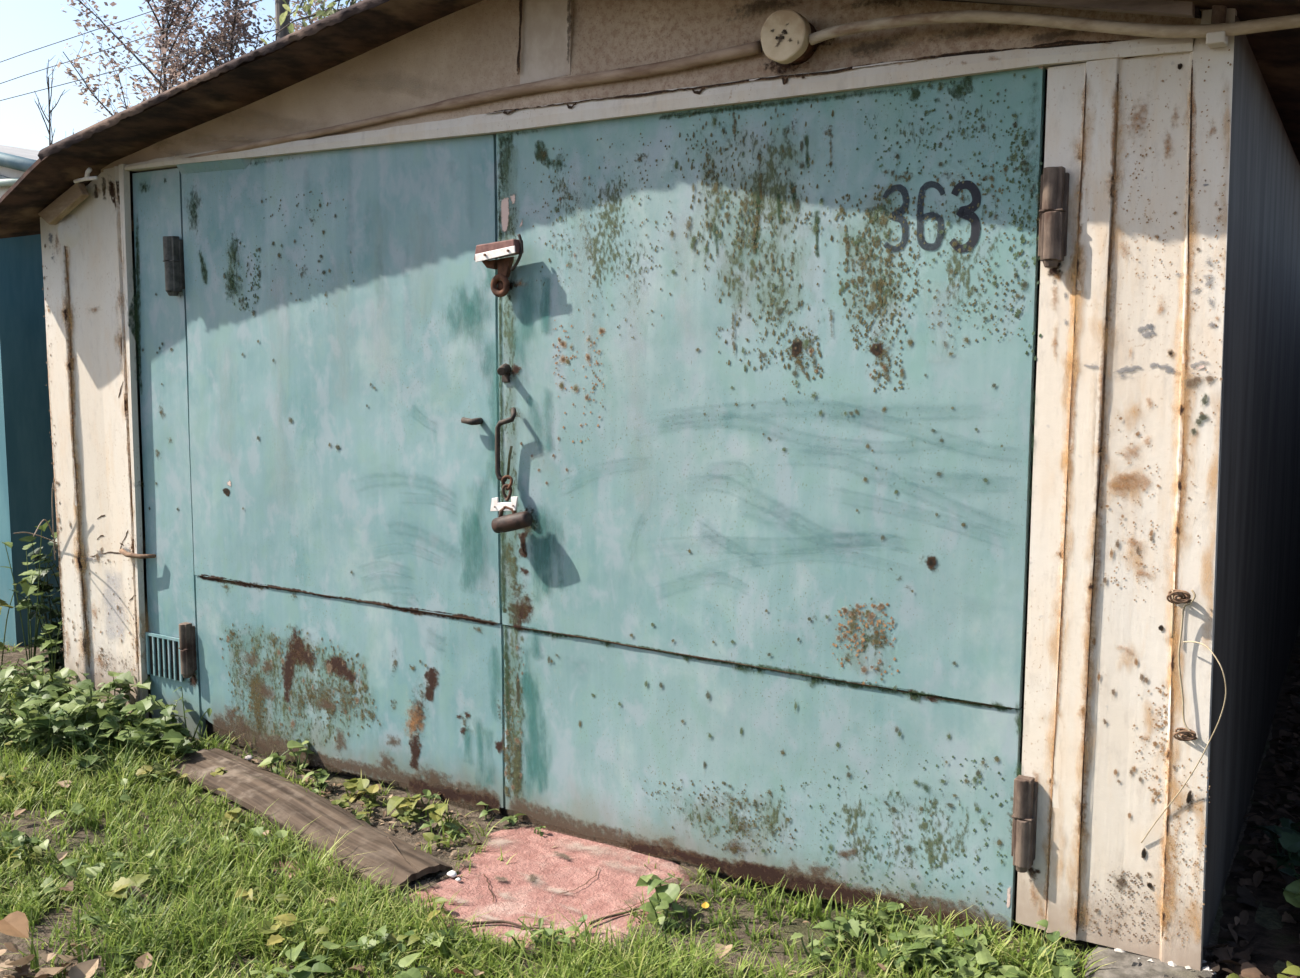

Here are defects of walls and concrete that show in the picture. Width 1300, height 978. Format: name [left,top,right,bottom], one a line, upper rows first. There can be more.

corrosion [94,178,120,208]
leakage [535,141,552,167]
corrosion [509,74,1027,443]
corrosion [42,237,140,676]
corrosion [124,398,157,561]
corrosion [199,508,1012,710]
corrosion [1074,58,1230,946]
corrosion [213,623,1013,937]